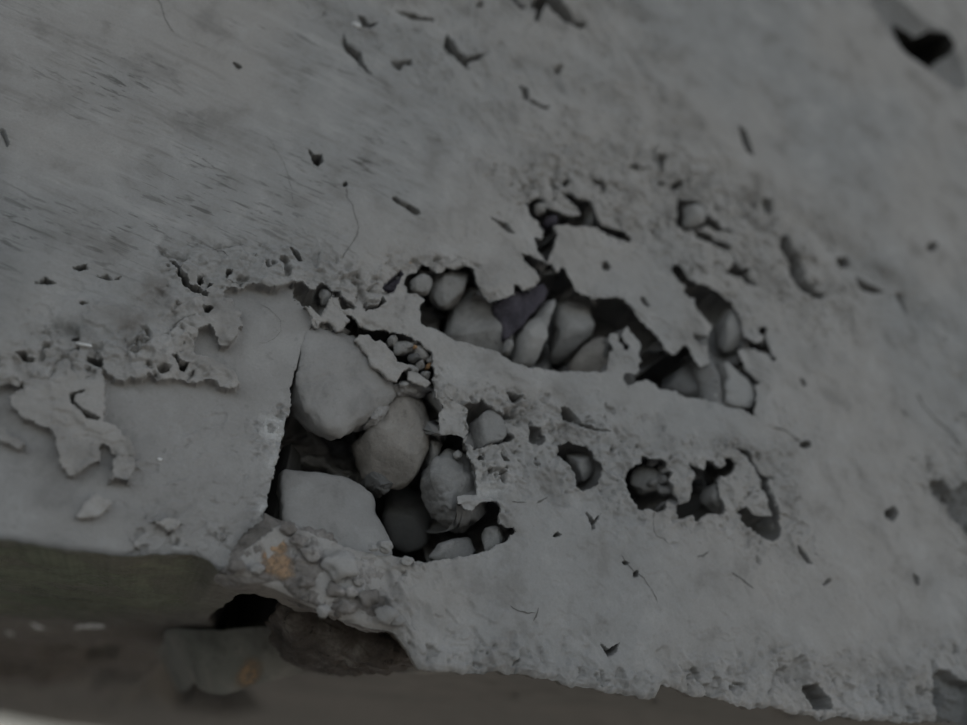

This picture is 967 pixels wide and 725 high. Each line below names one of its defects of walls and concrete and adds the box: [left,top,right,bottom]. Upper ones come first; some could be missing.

hole [392,196,422,215]
hole [762,197,775,214]
spalling [489,216,515,234]
peeling [354,334,431,388]
spalling [506,391,525,404]
peeling [426,397,469,443]
spalling [561,406,611,432]
spalling [0,247,414,677]